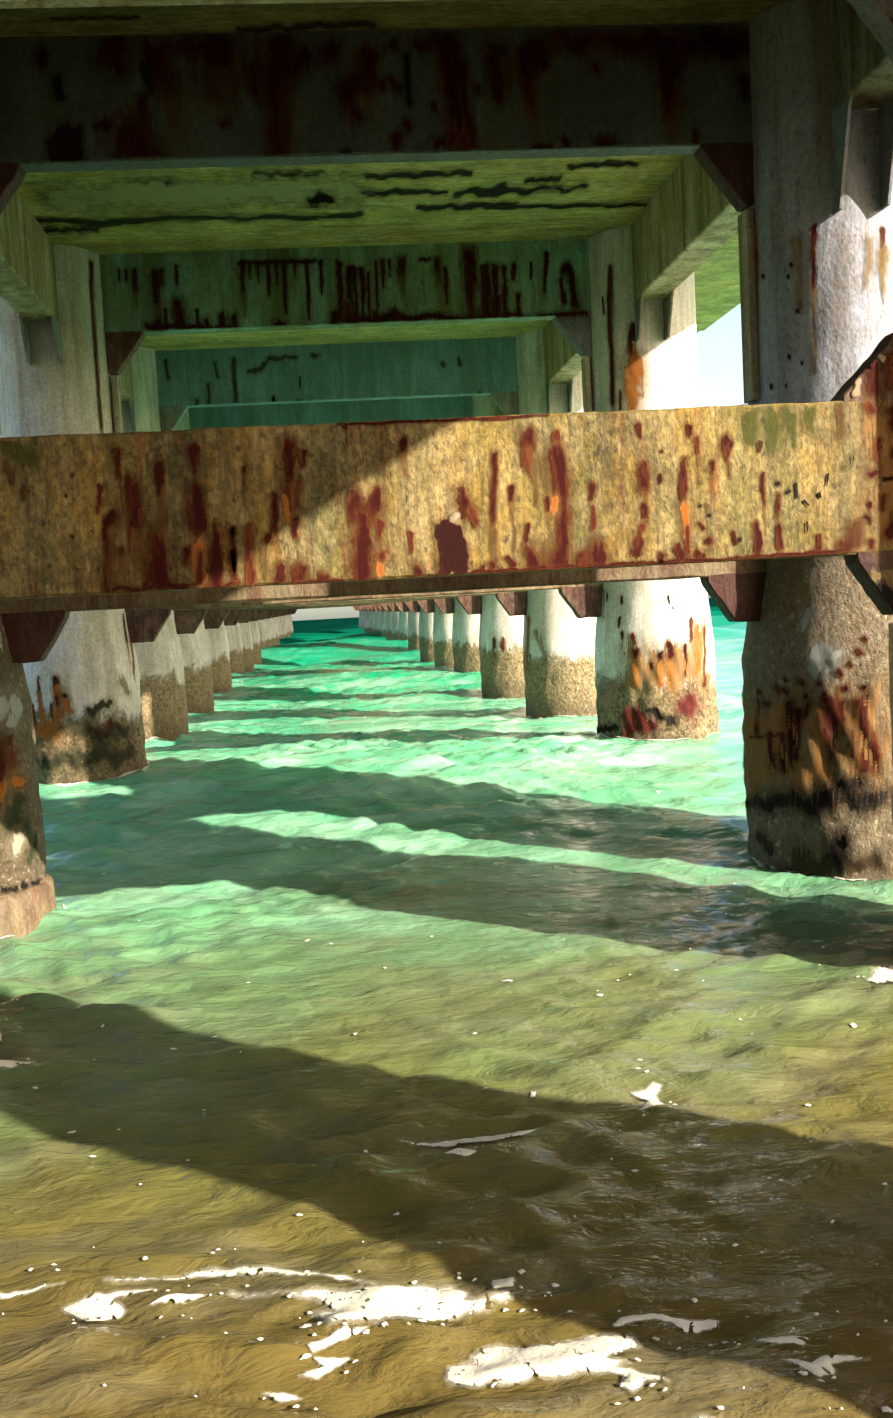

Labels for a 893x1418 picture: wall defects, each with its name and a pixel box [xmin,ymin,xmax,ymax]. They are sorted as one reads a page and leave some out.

rust [46,93,157,162]
rust [117,264,238,331]
rust [238,250,644,438]
rust [790,225,817,375]
rust [863,226,891,294]
rust [96,438,390,592]
rust [337,353,893,577]
rust [117,614,135,695]
rust [526,616,547,670]
rust [603,589,712,697]
rust [32,675,74,743]
rust [742,678,892,803]